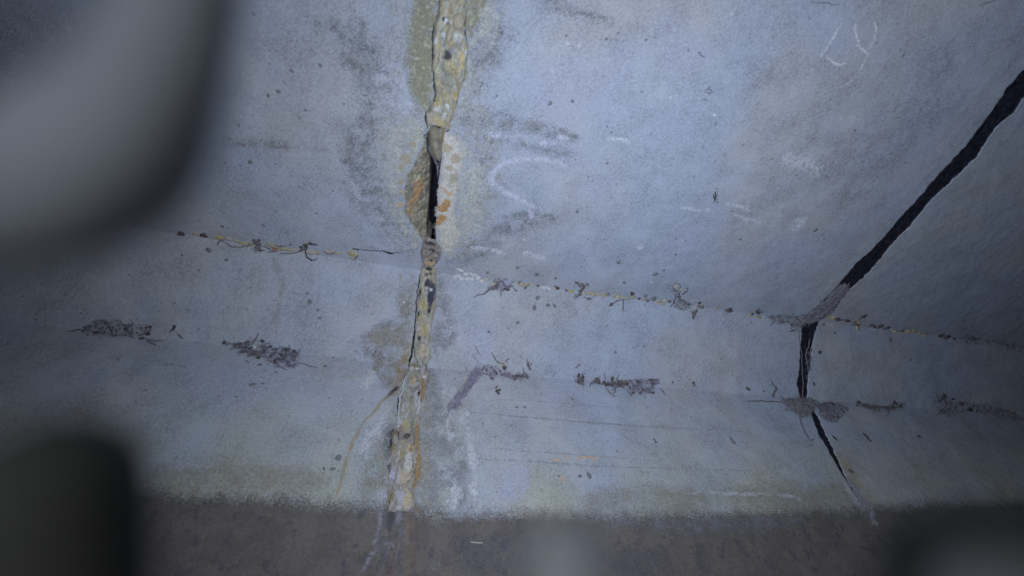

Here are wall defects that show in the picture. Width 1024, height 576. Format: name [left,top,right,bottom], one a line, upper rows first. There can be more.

leakage [302,0,579,267]
rust [435,186,453,226]
rust [336,341,414,496]
rust [408,424,422,489]
leakage [152,257,1024,576]